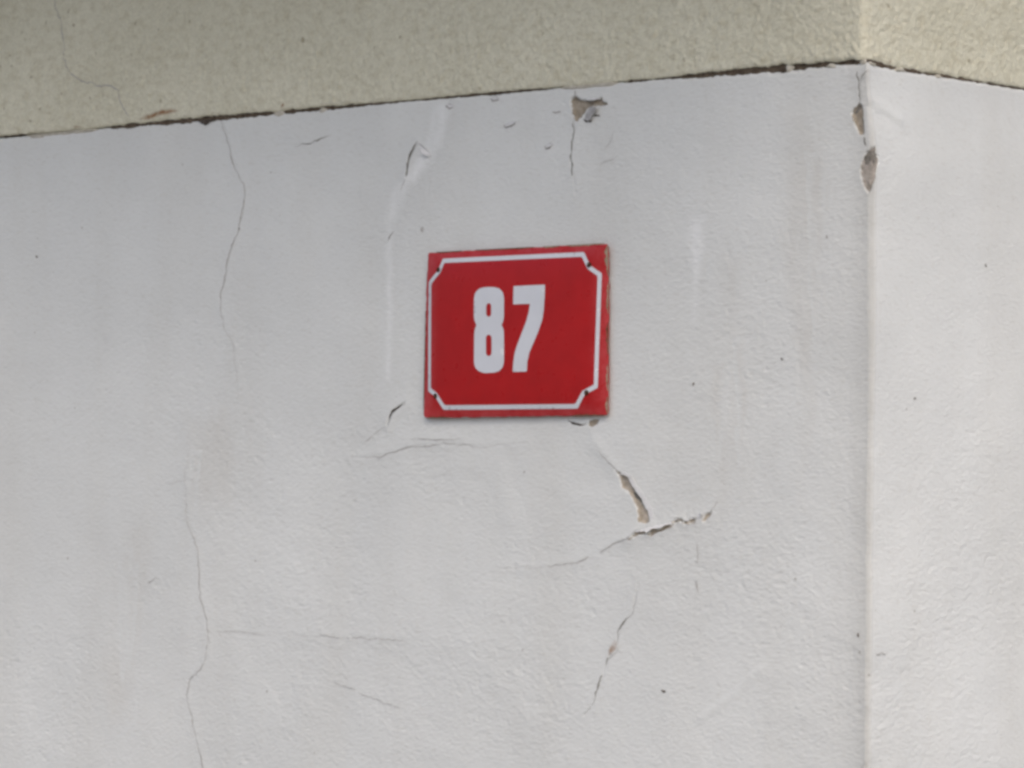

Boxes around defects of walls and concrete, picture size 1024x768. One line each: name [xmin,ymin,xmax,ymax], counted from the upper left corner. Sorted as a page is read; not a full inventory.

spalling [553,91,607,122]
spalling [852,103,878,192]
crack [220,121,245,420]
crack [569,419,599,427]
spalling [596,449,716,552]
crack [585,600,636,713]